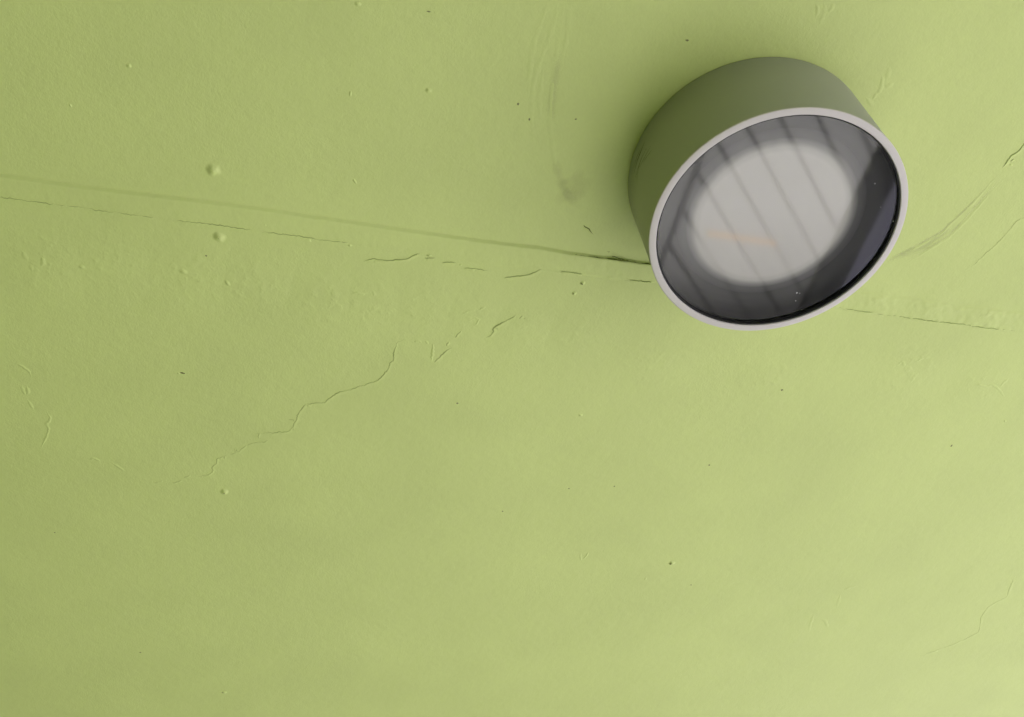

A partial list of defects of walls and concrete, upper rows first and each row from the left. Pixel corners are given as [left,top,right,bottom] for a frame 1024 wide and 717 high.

crack [262,225,651,285]
crack [435,315,526,363]
crack [155,339,406,484]